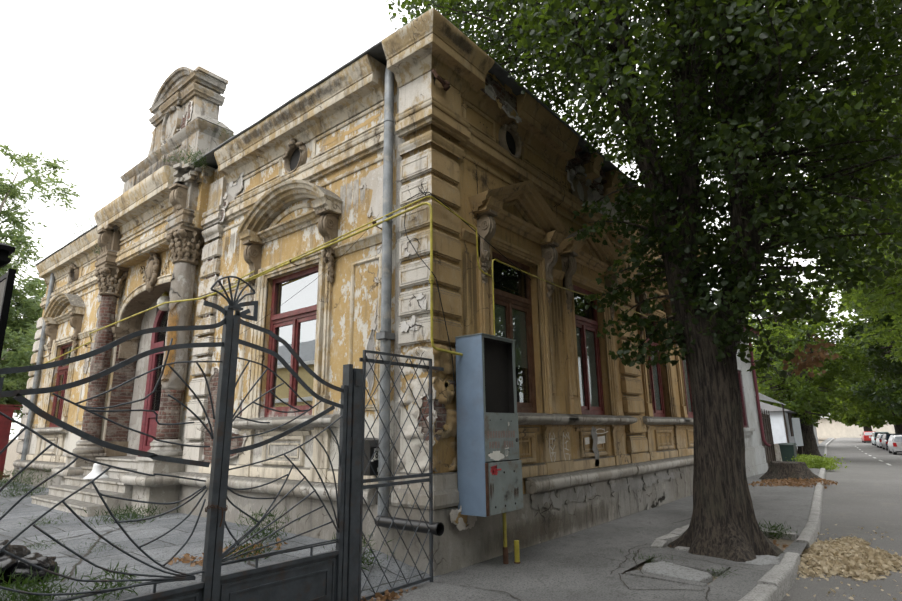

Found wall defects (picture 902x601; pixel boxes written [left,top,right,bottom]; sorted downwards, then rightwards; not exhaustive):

peeling [359,165,383,228]
peeling [403,241,418,257]
peeling [400,293,427,332]
peeling [366,300,380,399]
flaking render [416,380,456,447]